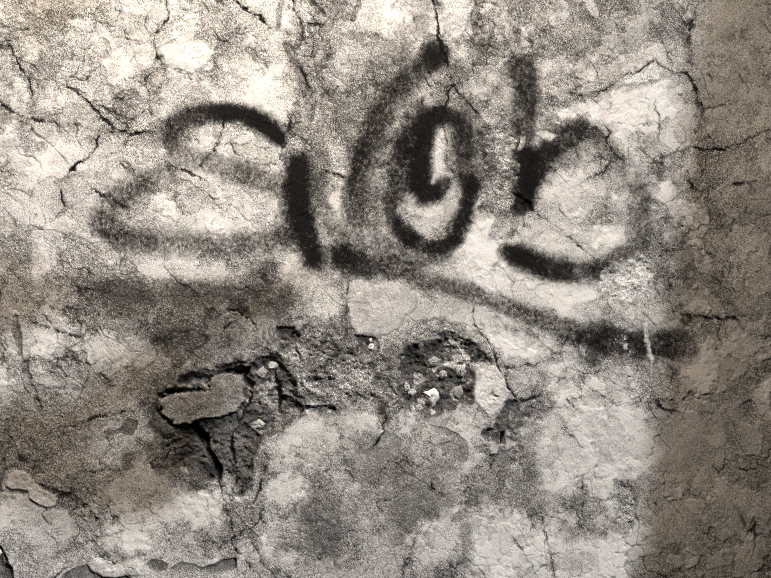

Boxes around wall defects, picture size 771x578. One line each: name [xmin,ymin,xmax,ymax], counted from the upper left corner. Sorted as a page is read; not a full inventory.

crack [3,25,34,98]
crack [0,101,55,123]
crack [154,0,170,67]
crack [235,0,268,26]
crack [432,0,481,145]
crack [598,55,704,115]
crack [60,86,149,206]
crack [92,188,131,210]
spalling [104,280,556,497]